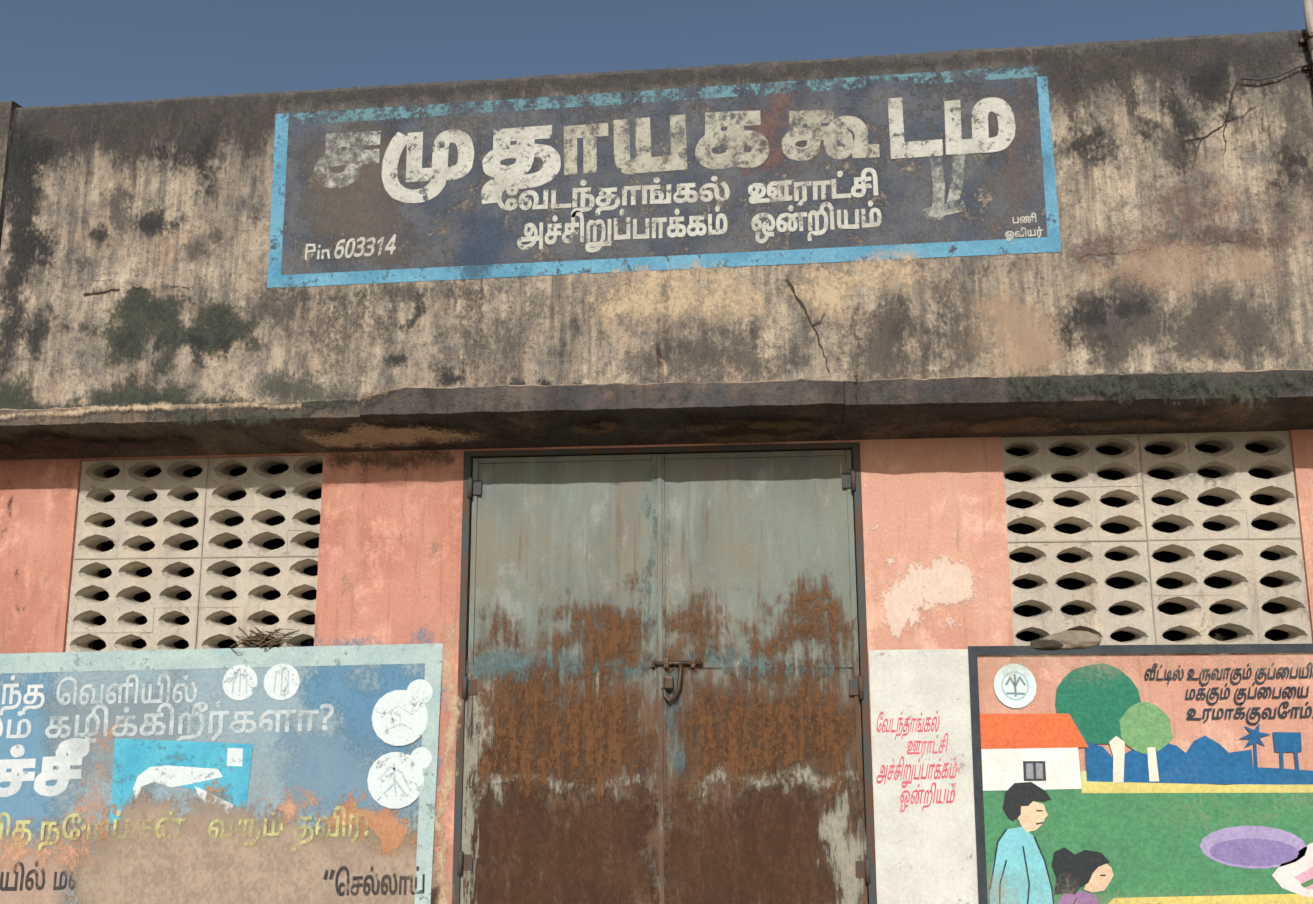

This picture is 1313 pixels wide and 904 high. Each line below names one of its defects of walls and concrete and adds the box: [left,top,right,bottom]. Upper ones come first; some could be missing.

water stain [1063,33,1313,197]
water stain [0,108,272,377]
water stain [1053,225,1303,369]
peeling [876,555,982,640]
rust [463,574,865,904]
peeling [277,787,415,857]